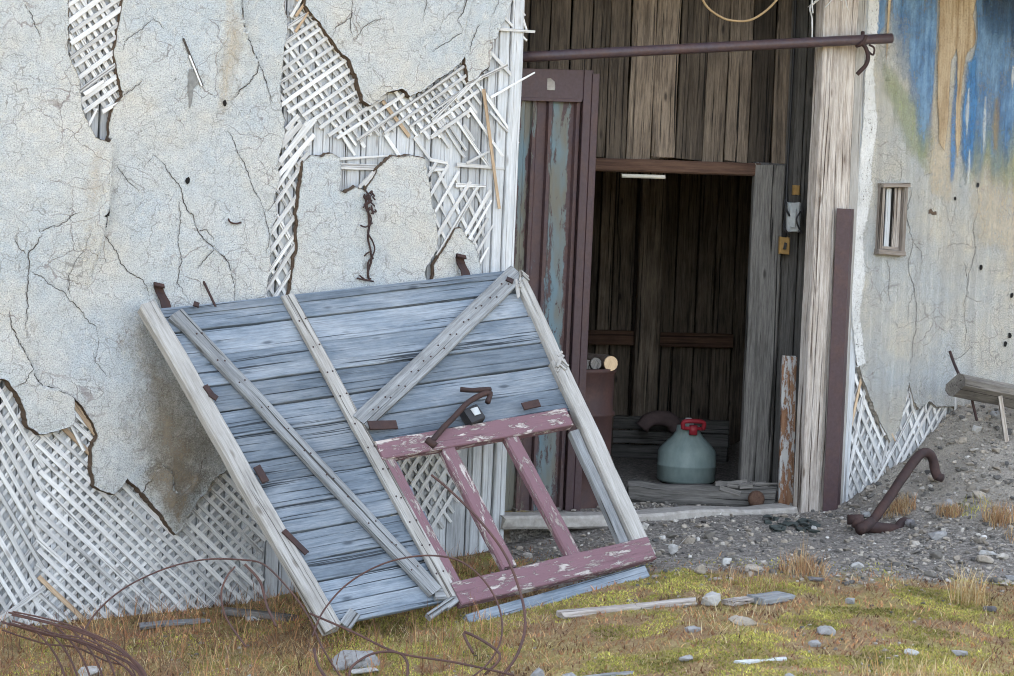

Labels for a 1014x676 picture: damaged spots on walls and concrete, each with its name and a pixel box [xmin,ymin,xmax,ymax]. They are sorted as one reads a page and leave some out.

crack [9,212,149,396]
flaking render [67,0,123,142]
crack [148,158,235,301]
crack [227,131,276,253]
crack [235,4,273,103]
flaking render [265,0,535,298]
flaking render [848,0,957,501]
leakage [877,0,1014,262]
flaking render [0,379,267,628]
crack [141,459,204,497]